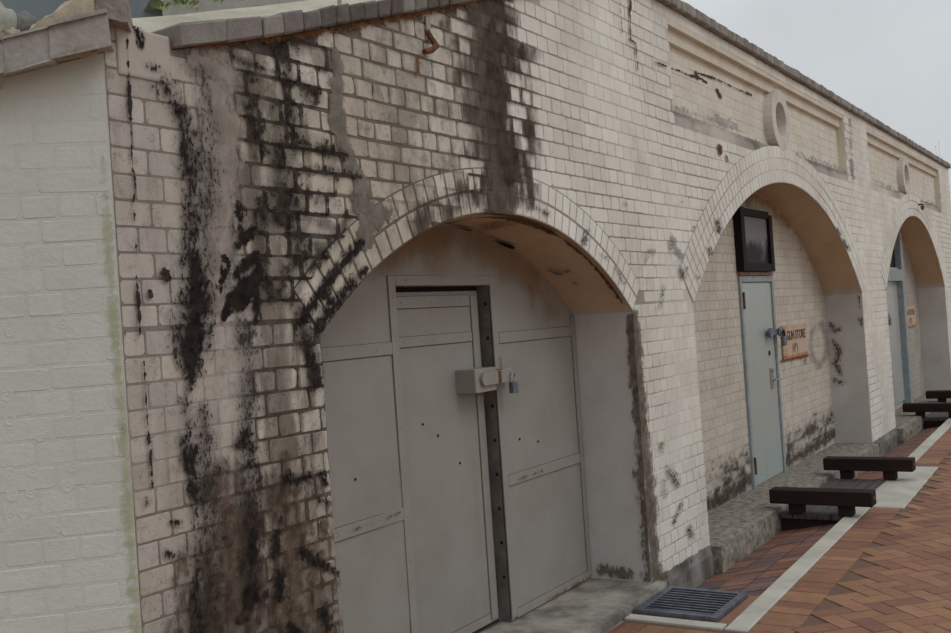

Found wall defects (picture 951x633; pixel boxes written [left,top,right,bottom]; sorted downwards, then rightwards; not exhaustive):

leakage [133,26,144,50]
leakage [230,36,369,392]
leakage [411,0,549,237]
crack [620,0,752,96]
leakage [146,64,344,633]
leakage [597,310,680,583]
leakage [707,444,752,511]
leakage [786,409,835,470]